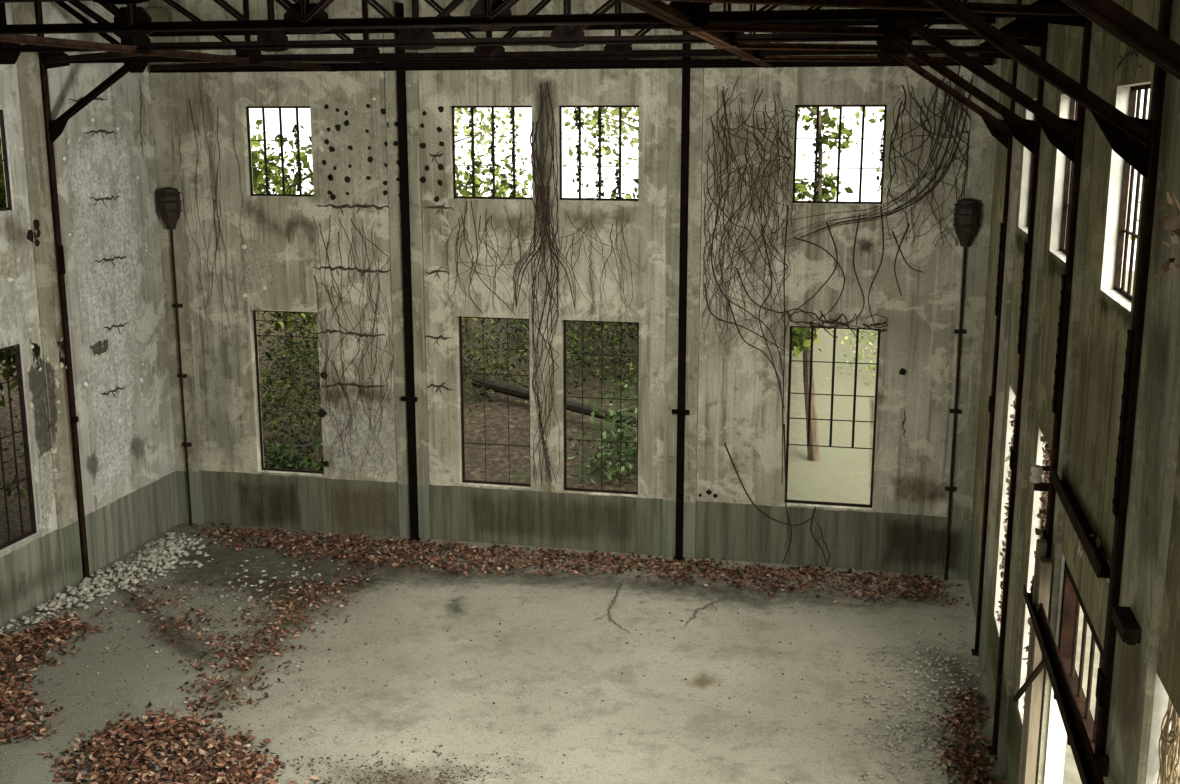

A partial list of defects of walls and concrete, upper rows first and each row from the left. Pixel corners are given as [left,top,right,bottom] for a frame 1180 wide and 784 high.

flaking render [26,328,67,528]
peeling [63,118,148,505]